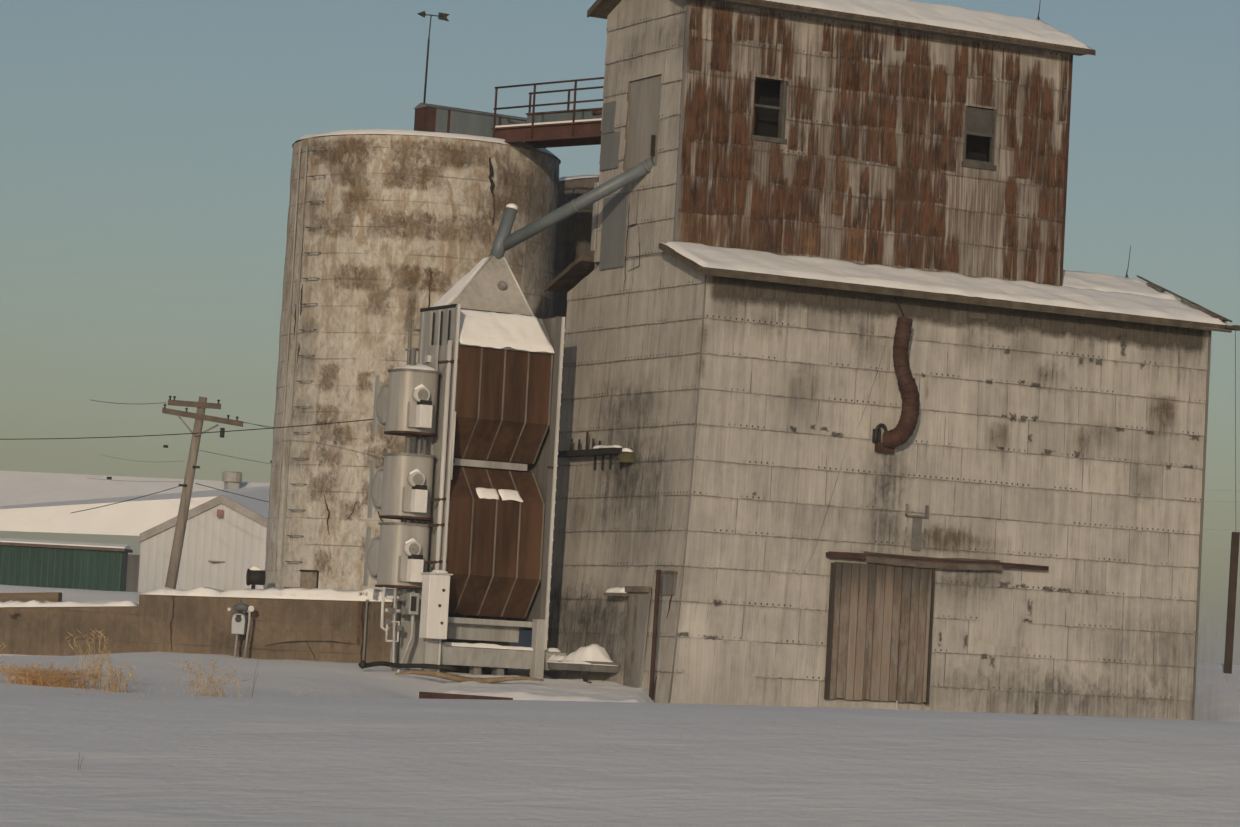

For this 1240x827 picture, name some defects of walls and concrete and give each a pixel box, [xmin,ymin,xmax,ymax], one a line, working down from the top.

crack [487,157,495,225]
corrosion [680,0,1070,285]